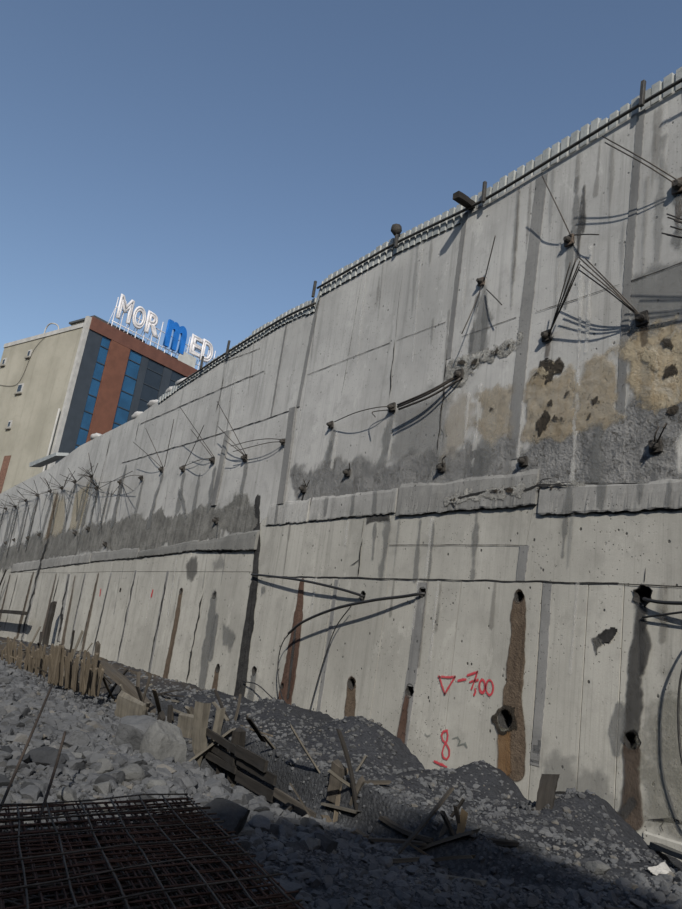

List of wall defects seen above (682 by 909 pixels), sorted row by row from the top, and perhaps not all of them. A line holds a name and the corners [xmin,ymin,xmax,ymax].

leakage [630,264,682,339]
spalling [445,332,523,388]
leakage [290,397,682,506]
spalling [478,386,511,445]
spalling [521,320,682,443]
leakage [0,466,258,572]
corrosion [163,589,183,679]
corrosion [278,578,304,705]
corrosion [397,695,409,743]
corrosion [497,598,526,781]
spalling [592,627,617,655]
leakage [610,604,651,830]